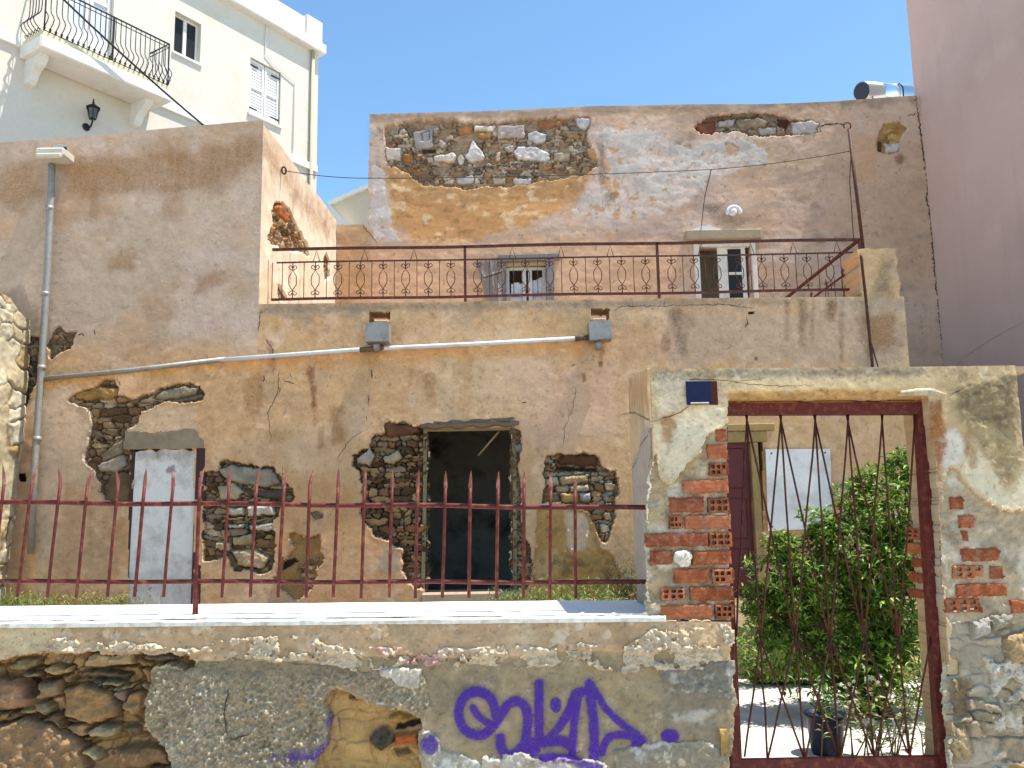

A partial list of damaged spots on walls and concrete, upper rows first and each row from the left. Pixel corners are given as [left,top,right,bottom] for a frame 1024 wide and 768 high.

flaking render [267,201,309,255]
flaking render [369,112,820,244]
crack [909,95,1021,393]
flaking render [24,326,95,407]
flaking render [69,380,205,502]
flaking render [0,417,735,768]
flaking render [938,468,1024,768]